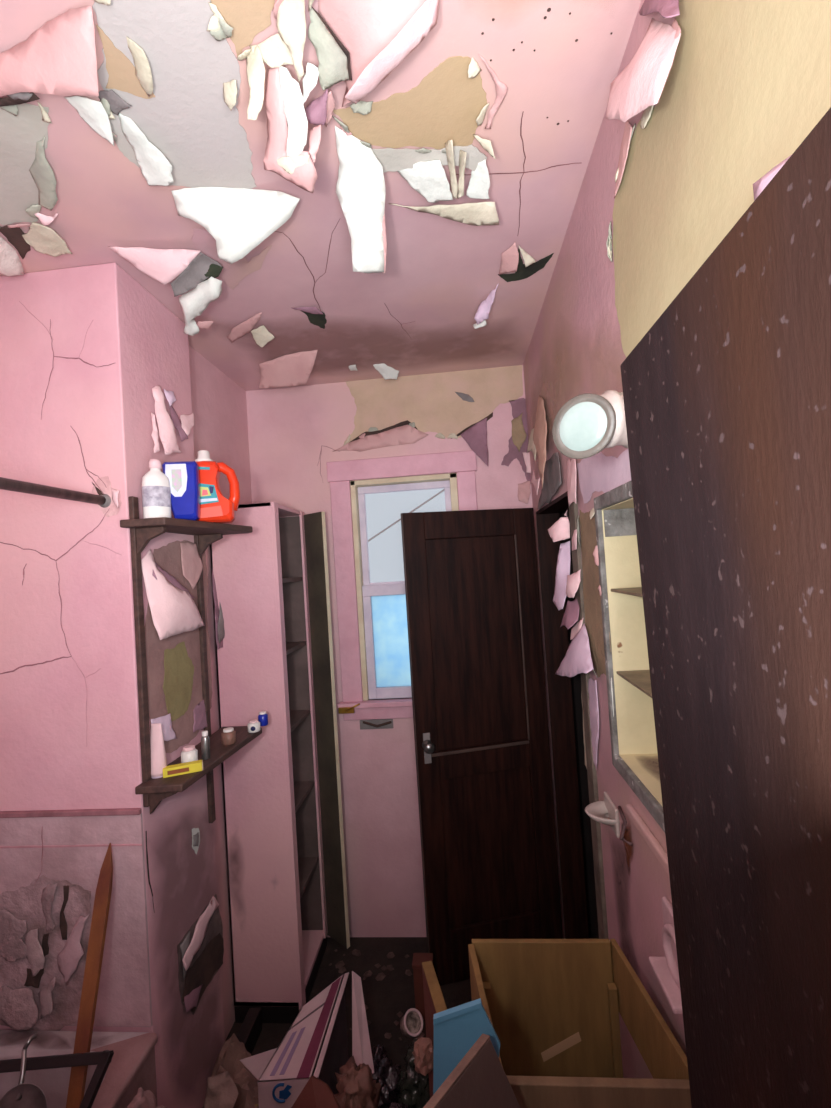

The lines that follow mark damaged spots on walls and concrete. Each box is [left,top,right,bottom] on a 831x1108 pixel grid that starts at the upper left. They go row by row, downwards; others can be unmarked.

peeling [0,0,508,336]
peeling [605,0,831,358]
crack [19,301,114,417]
peeling [150,385,195,455]
peeling [259,350,318,389]
crack [274,219,340,311]
peeling [472,242,537,329]
crack [0,427,121,741]
peeling [141,540,225,753]
peeling [332,363,631,770]
spalling [0,875,92,1031]
spalling [177,894,224,1015]